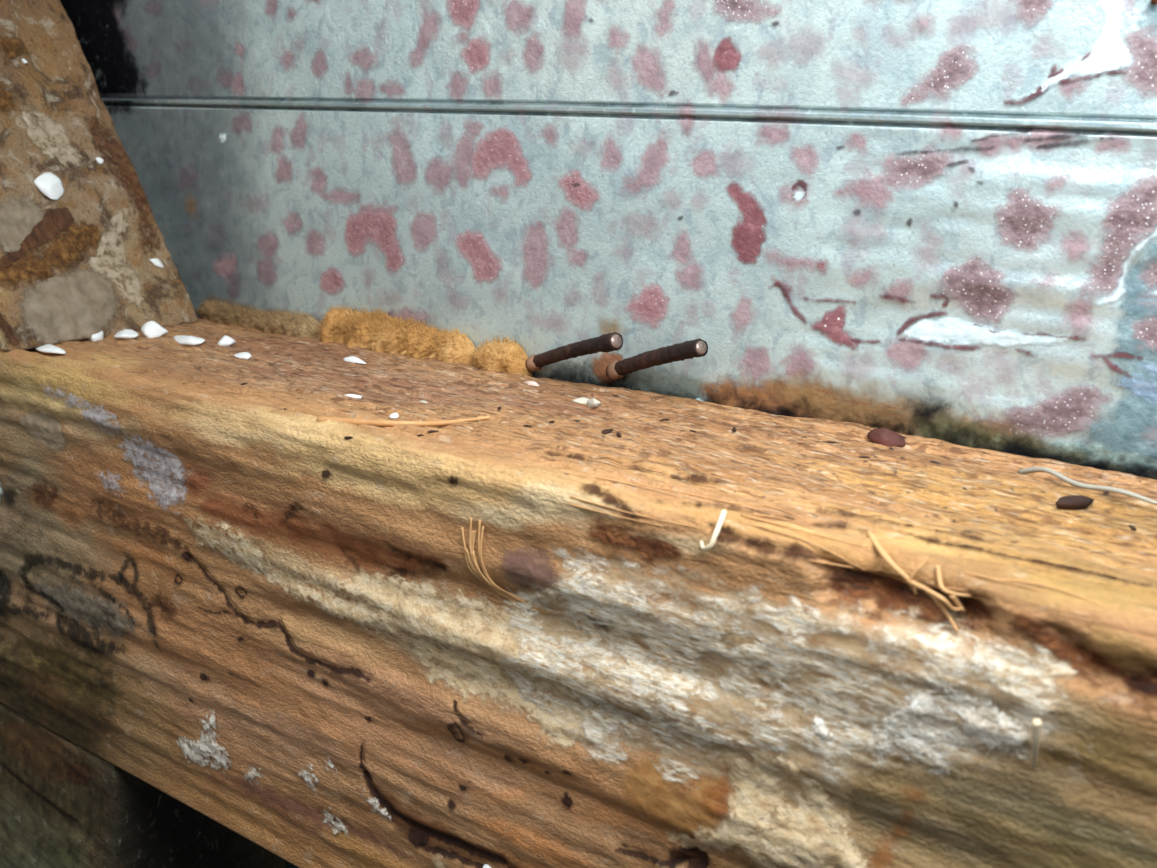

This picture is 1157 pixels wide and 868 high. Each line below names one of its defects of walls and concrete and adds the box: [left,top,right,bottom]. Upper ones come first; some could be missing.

rust [593,352,623,384]
rust [704,379,1009,437]
leakage [915,404,1126,470]
leakage [0,487,15,504]
leakage [0,551,177,658]